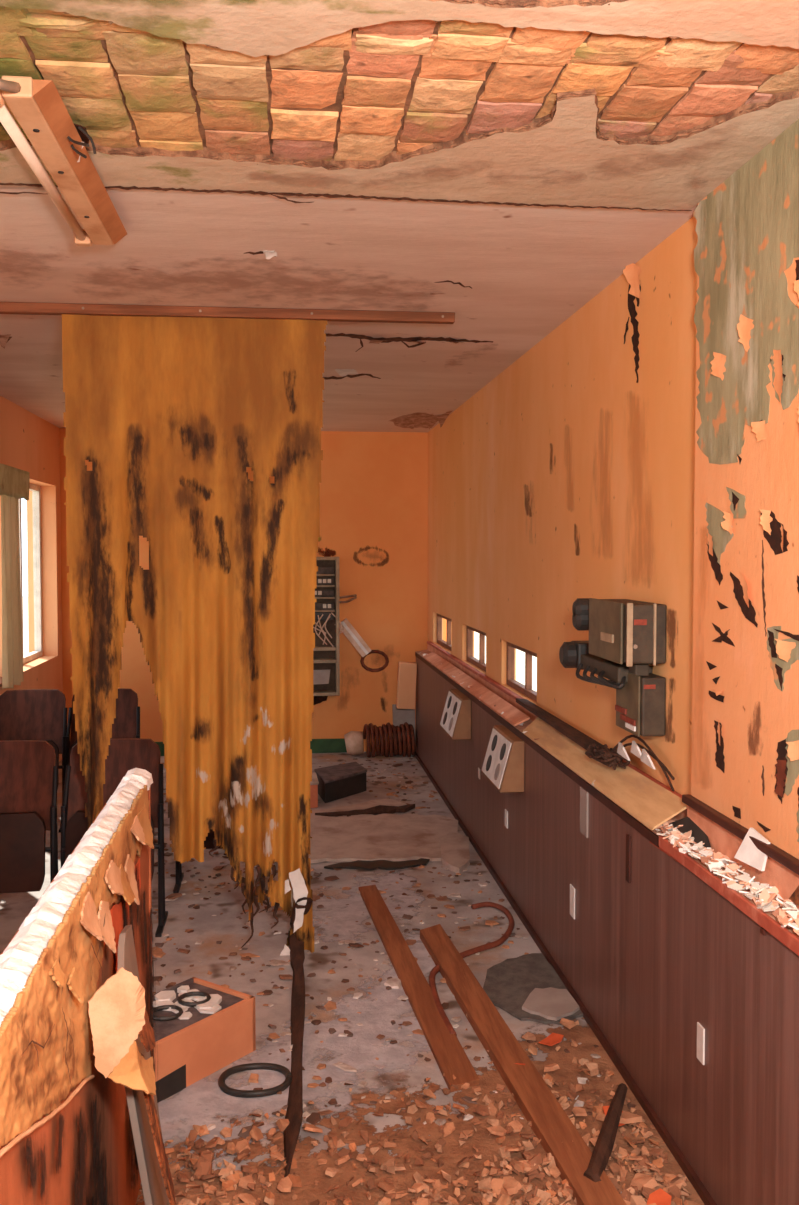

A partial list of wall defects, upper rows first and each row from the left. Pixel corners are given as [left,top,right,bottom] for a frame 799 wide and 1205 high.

flaking render [0,6,799,169]
crack [0,183,58,194]
crack [105,186,692,211]
peeling [693,119,799,464]
crack [323,333,493,380]
peeling [705,487,799,691]
peeling [706,661,724,702]
peeling [714,720,725,773]
peeling [774,730,799,842]
flaking render [0,785,176,1205]
leakage [25,1114,64,1198]
leakage [74,1096,110,1205]